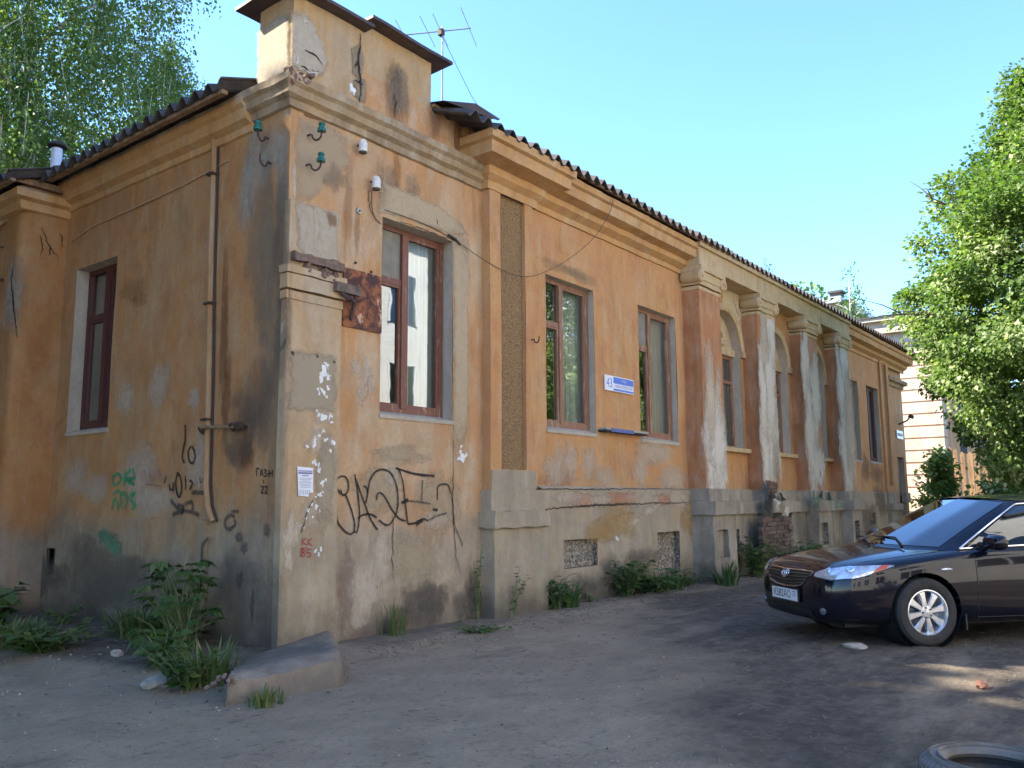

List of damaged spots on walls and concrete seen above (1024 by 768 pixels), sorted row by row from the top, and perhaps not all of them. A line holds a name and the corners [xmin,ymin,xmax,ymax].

crack [355,34,363,103]
water stain [391,68,407,117]
crack [4,269,22,335]
crack [40,227,63,257]
water stain [239,132,287,370]
peeling [283,409,336,573]
peeling [316,362,331,399]
crack [536,488,689,510]
peeling [702,352,728,489]
peeling [757,311,794,575]
peeling [800,331,831,501]
peeling [835,343,856,491]